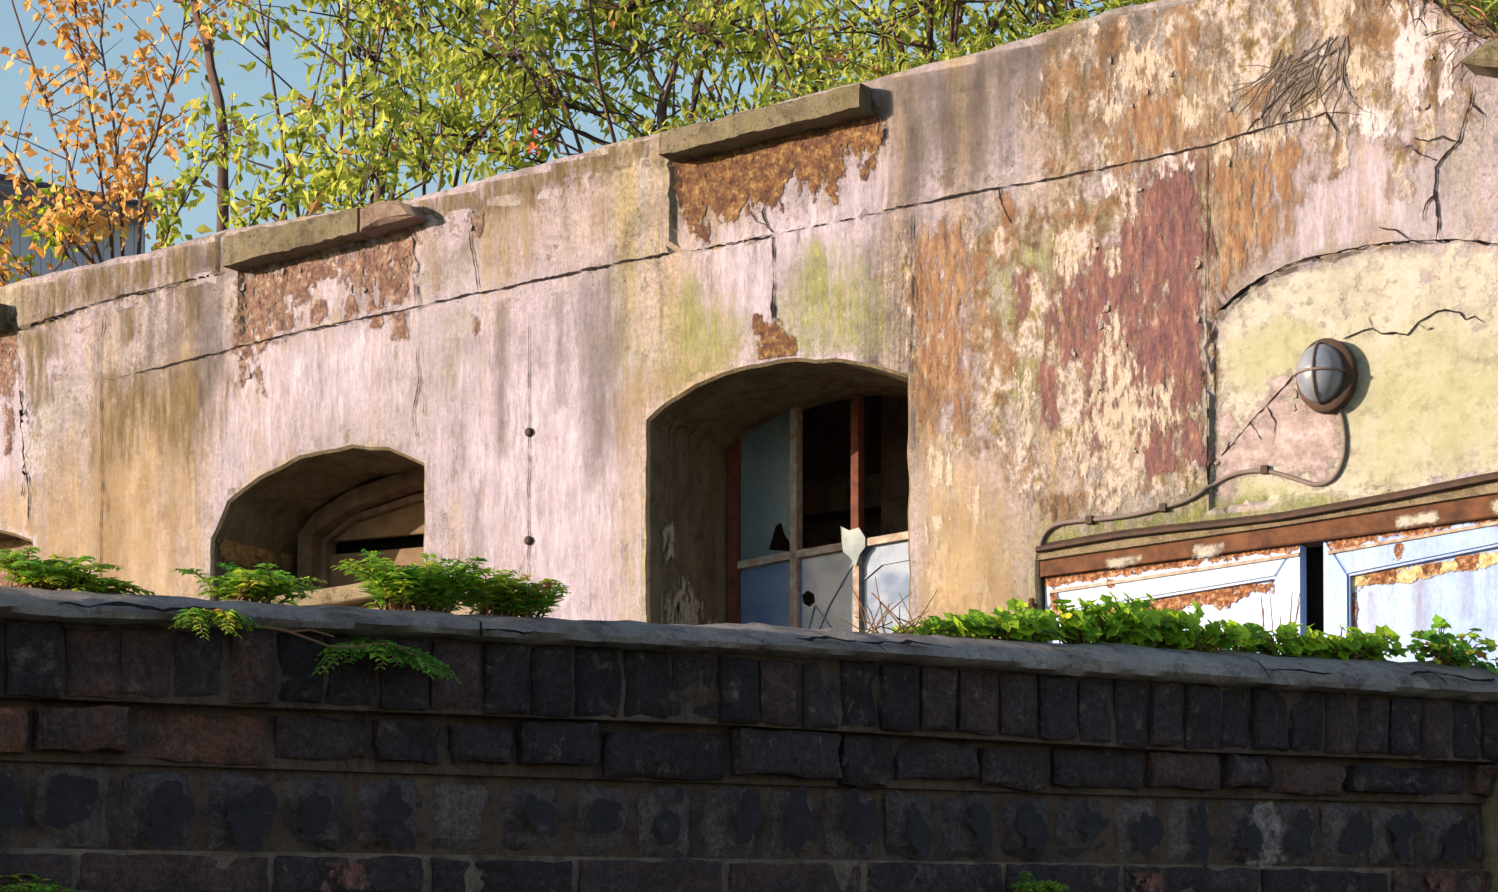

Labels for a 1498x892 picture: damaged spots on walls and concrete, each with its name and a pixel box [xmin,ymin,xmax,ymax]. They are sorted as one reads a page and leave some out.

spalling [659,100,890,245]
peeling [0,308,22,457]
crack [18,272,225,520]
peeling [227,225,421,397]
spalling [752,313,797,360]
crack [59,77,1498,620]
peeling [895,0,1498,528]
peeling [661,577,717,625]
peeling [1108,556,1141,567]
corrosion [1042,544,1300,619]
peeling [1193,543,1224,558]
corrosion [1326,518,1498,635]